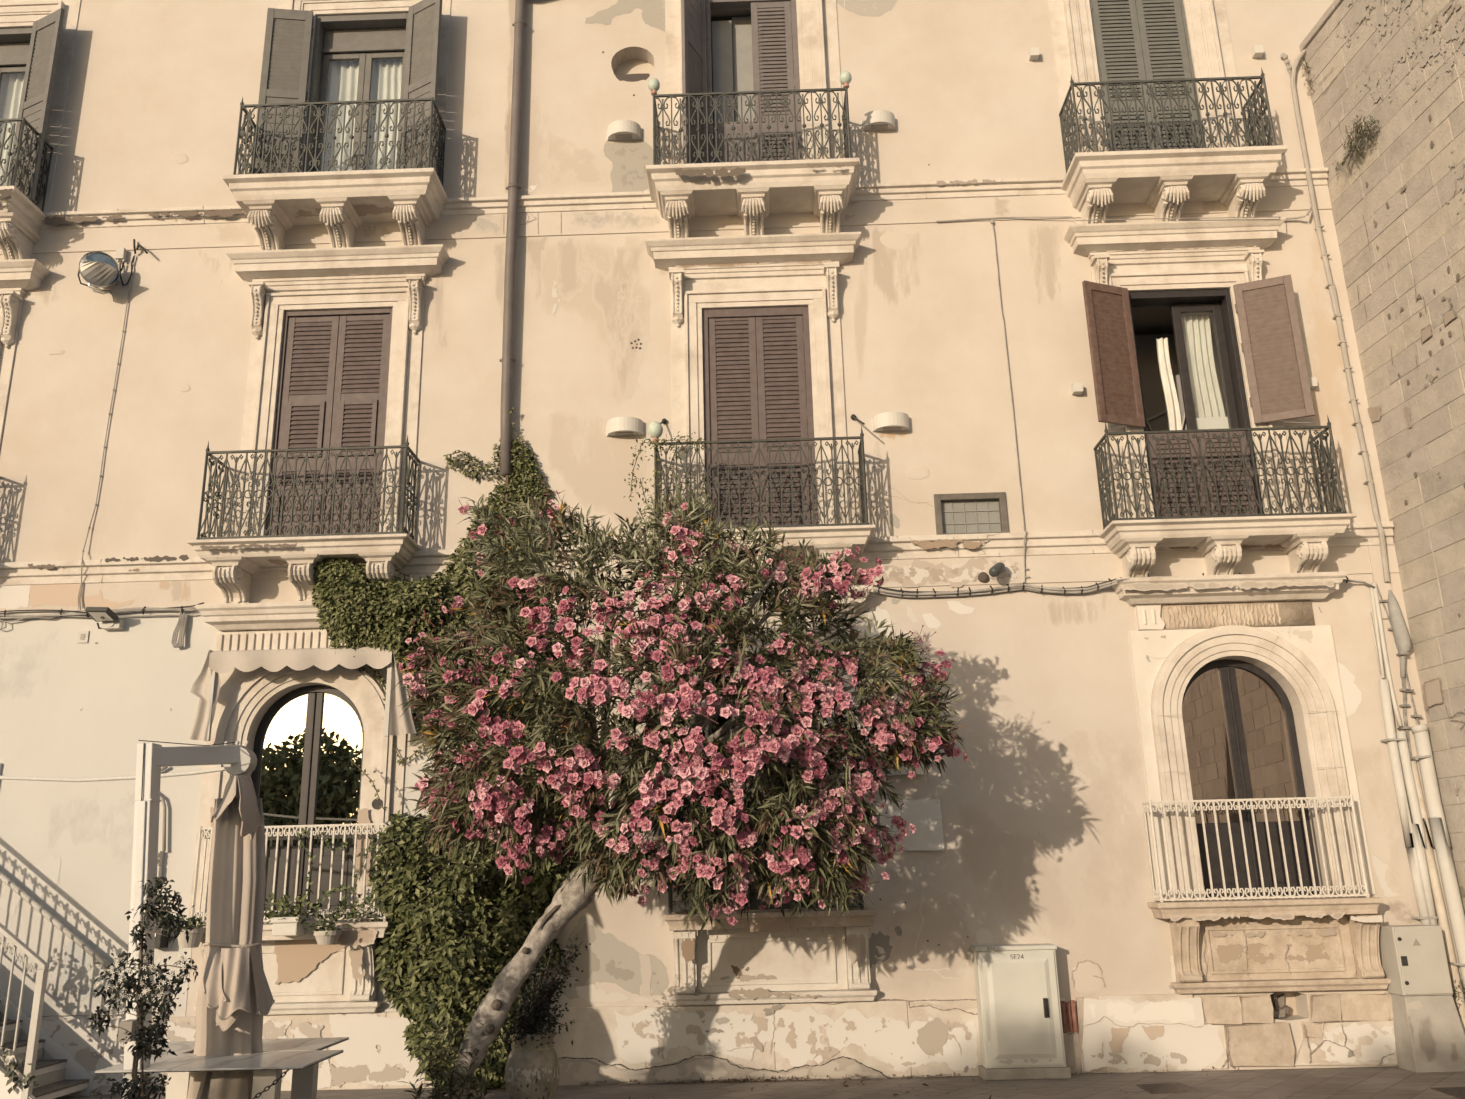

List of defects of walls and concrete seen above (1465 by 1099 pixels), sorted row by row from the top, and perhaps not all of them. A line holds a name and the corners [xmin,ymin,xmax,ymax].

peeling [585,0,665,31]
peeling [41,1018,125,1090]
spalling [505,1010,972,1099]
peeling [1109,1025,1164,1054]